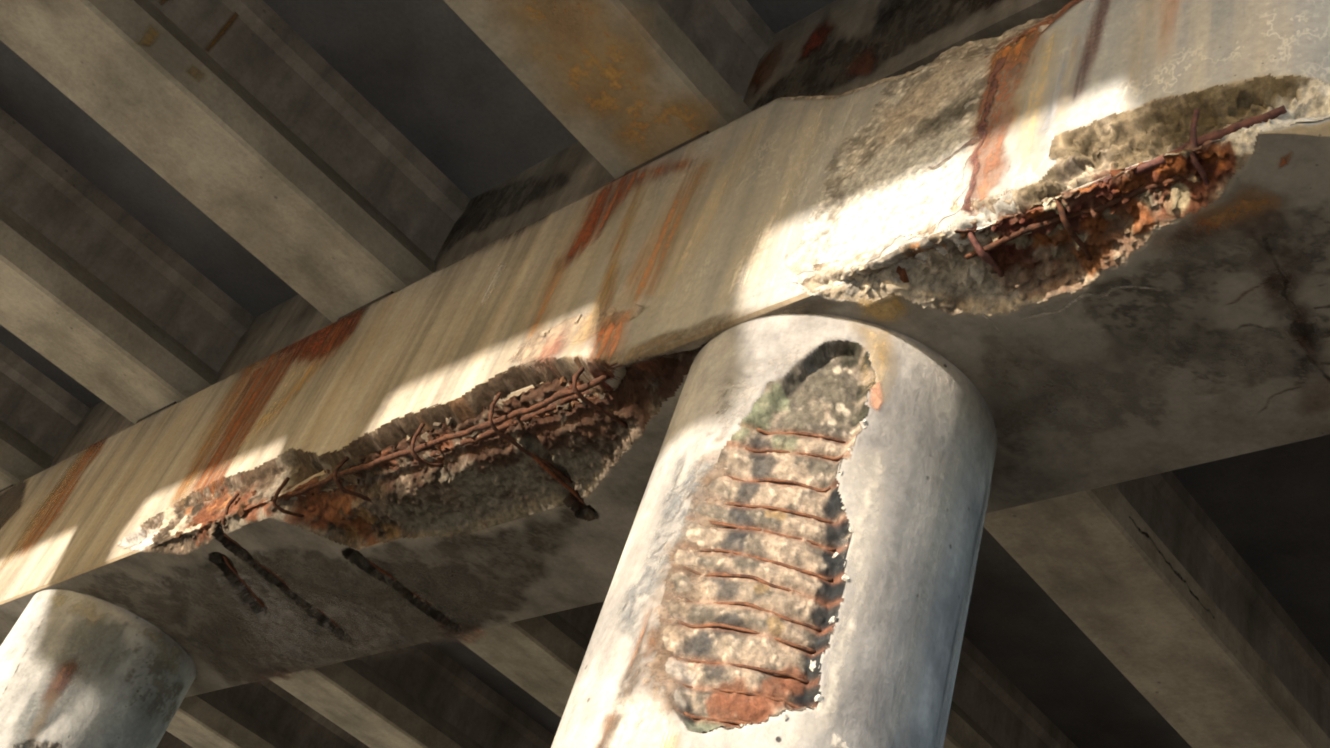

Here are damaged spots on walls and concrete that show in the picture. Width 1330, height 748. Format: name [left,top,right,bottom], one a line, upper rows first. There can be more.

corrosion [969,0,1109,207]
spalling [797,74,1330,317]
corrosion [5,439,105,565]
corrosion [175,309,365,499]
spalling [118,304,708,555]
spalling [656,340,876,733]
leakage [983,209,1330,452]
crack [1206,238,1330,409]
spalling [12,739,62,748]
corrosion [45,661,77,703]